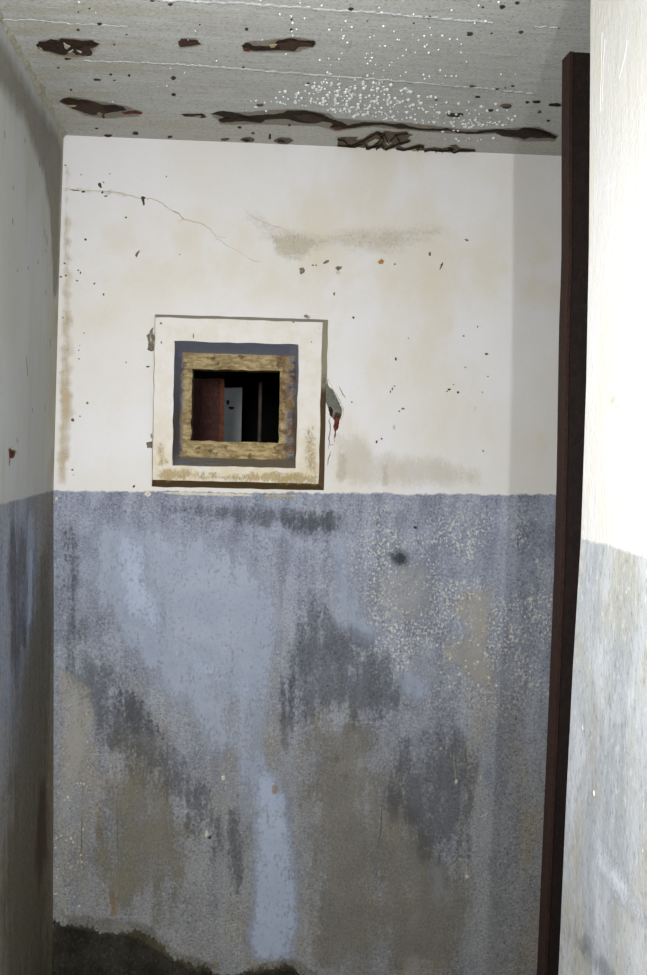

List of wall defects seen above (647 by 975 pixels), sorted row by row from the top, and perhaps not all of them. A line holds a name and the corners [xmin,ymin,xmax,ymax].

spalling [36,29,99,69]
spalling [178,39,201,47]
spalling [242,19,315,52]
spalling [59,89,142,118]
crack [63,188,253,261]
damp [330,532,374,647]
damp [52,520,303,975]
damp [37,788,84,907]